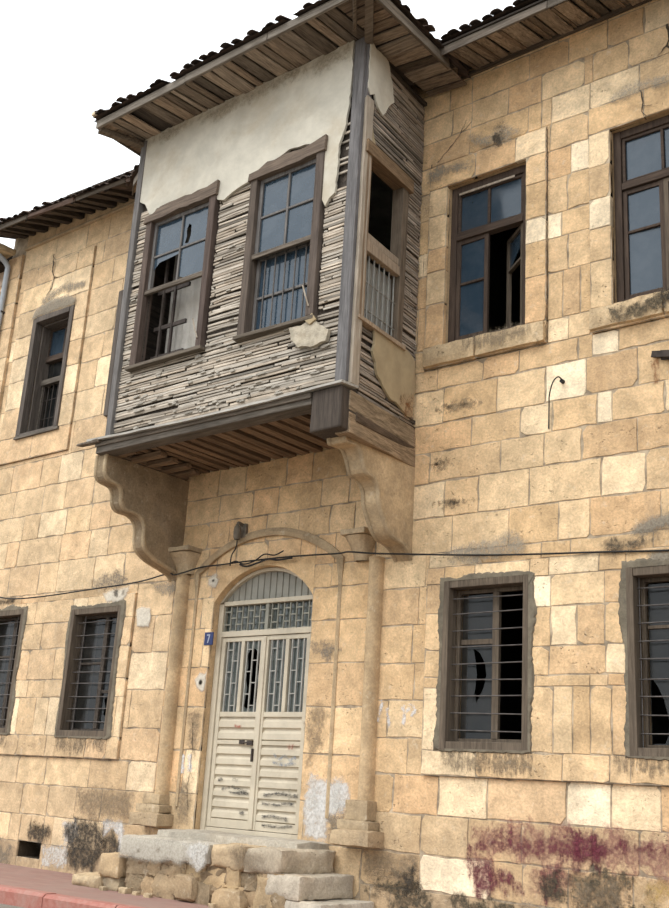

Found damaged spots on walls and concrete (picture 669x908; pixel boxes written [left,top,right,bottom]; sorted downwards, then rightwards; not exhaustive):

crack [657,24,669,56]
leakage [608,290,669,321]
flaking render [289,313,331,349]
leakage [443,751,532,775]
leakage [562,829,633,908]